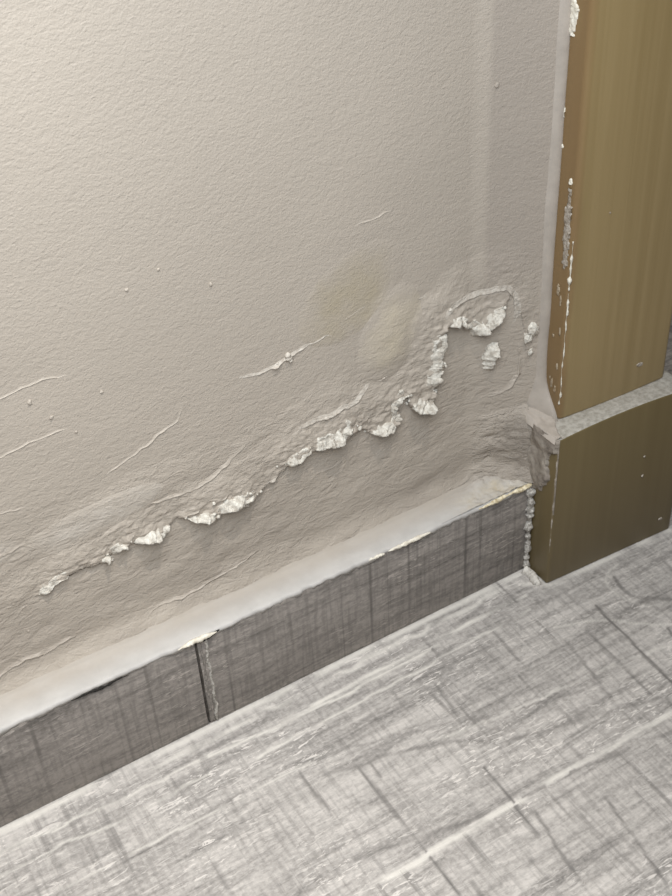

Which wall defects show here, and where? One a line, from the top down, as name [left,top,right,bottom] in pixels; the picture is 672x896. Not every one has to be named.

peeling [32,244,539,599]